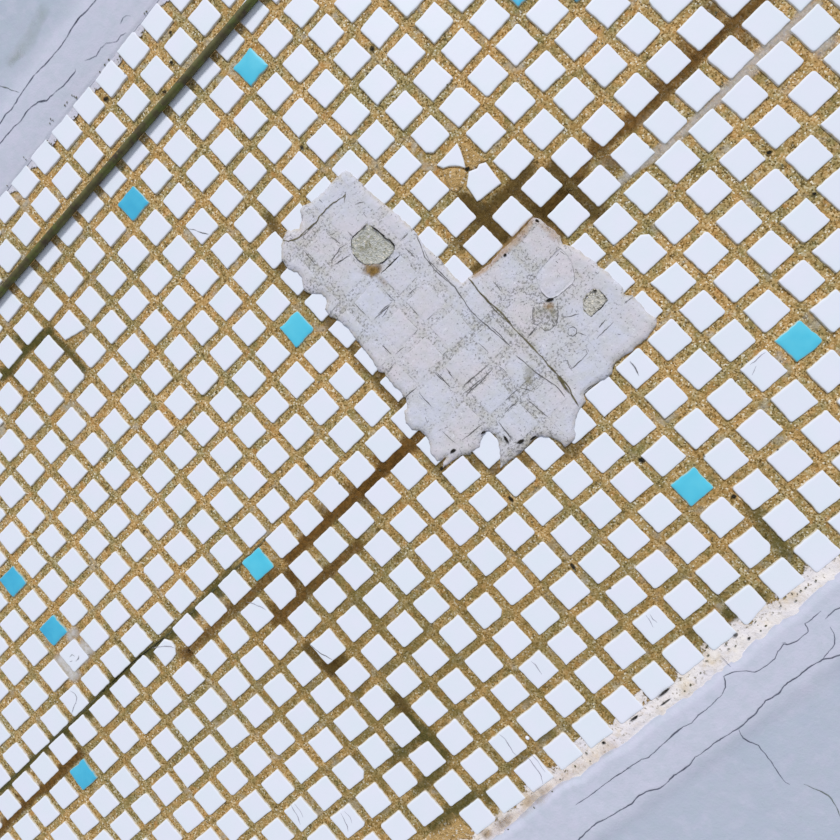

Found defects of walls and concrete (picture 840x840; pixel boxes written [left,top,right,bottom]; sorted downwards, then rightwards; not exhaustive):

crack [0,0,128,143]
leakage [641,6,815,167]
crack [402,233,606,442]
leakage [56,656,79,681]
crack [577,608,840,840]